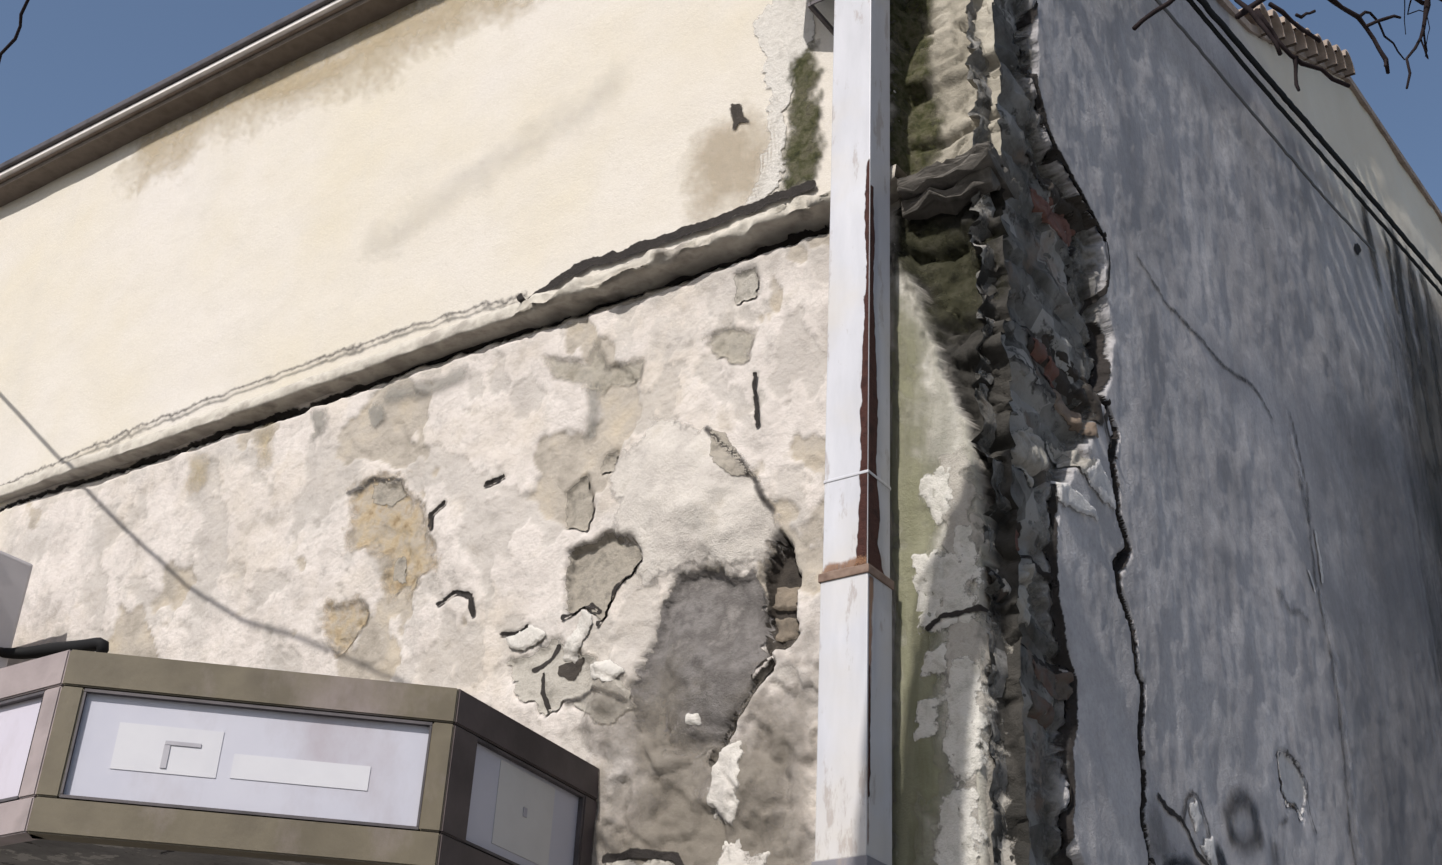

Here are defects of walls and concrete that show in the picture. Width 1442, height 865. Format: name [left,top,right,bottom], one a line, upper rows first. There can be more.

flaking render [734,268,758,304]
flaking render [347,477,436,595]
flaking render [546,342,643,438]
flaking render [708,329,754,364]
rust [822,160,884,796]
flaking render [911,0,1104,865]
crack [1013,0,1345,865]
damp [1362,205,1442,678]
flaking render [506,451,802,824]
flaking render [1276,750,1317,833]
flaking render [602,848,684,865]
flaking render [717,839,770,865]